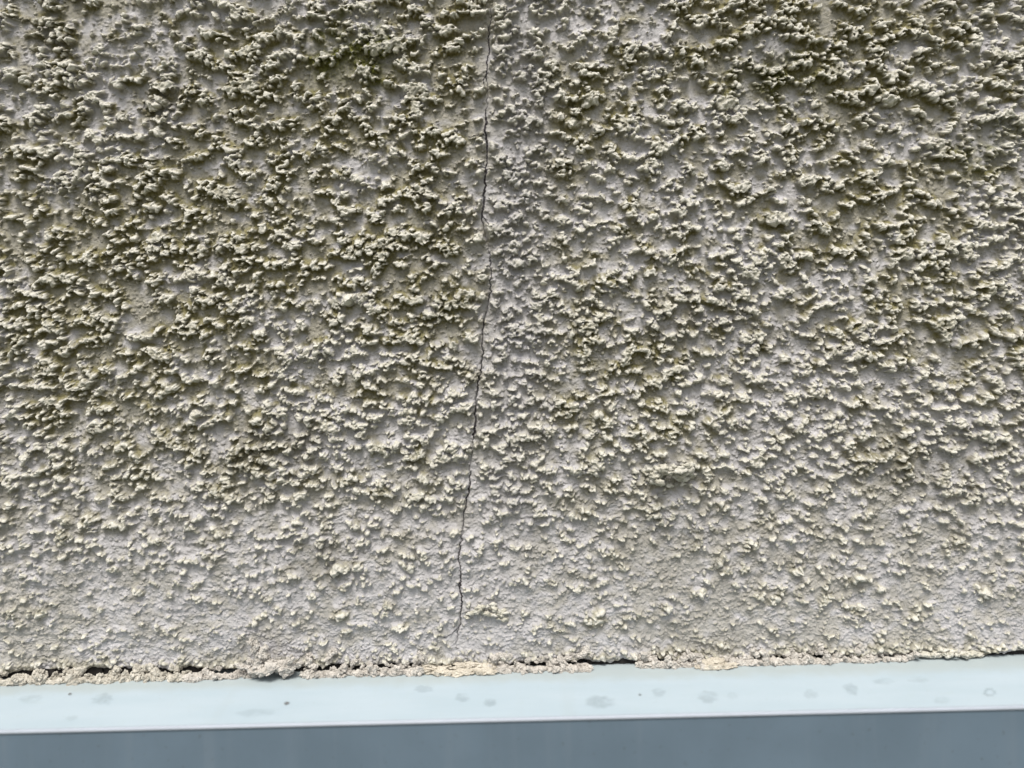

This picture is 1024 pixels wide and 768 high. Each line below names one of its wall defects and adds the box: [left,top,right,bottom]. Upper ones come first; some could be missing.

crack [443,4,493,646]